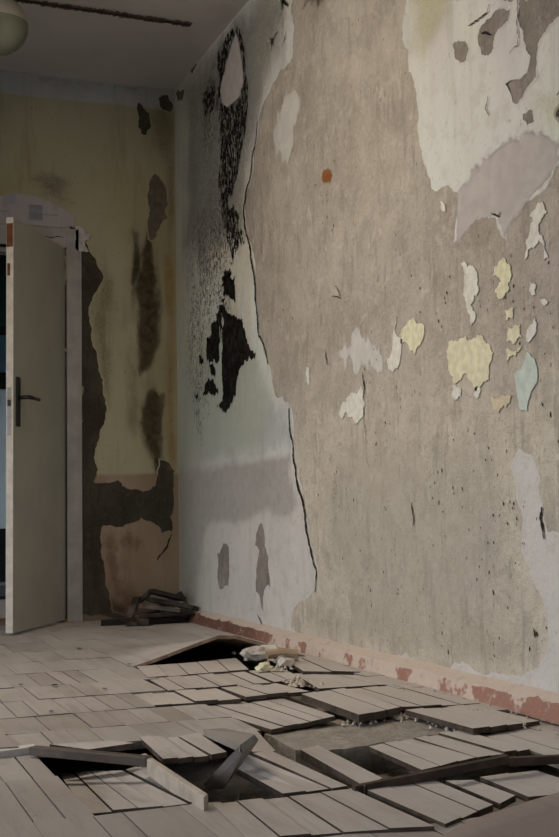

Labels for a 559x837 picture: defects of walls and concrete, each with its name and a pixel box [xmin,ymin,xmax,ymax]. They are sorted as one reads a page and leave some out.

crack [14,0,192,27]
flaking render [65,226,176,619]
damp [27,0,302,612]
flaking render [244,0,559,683]